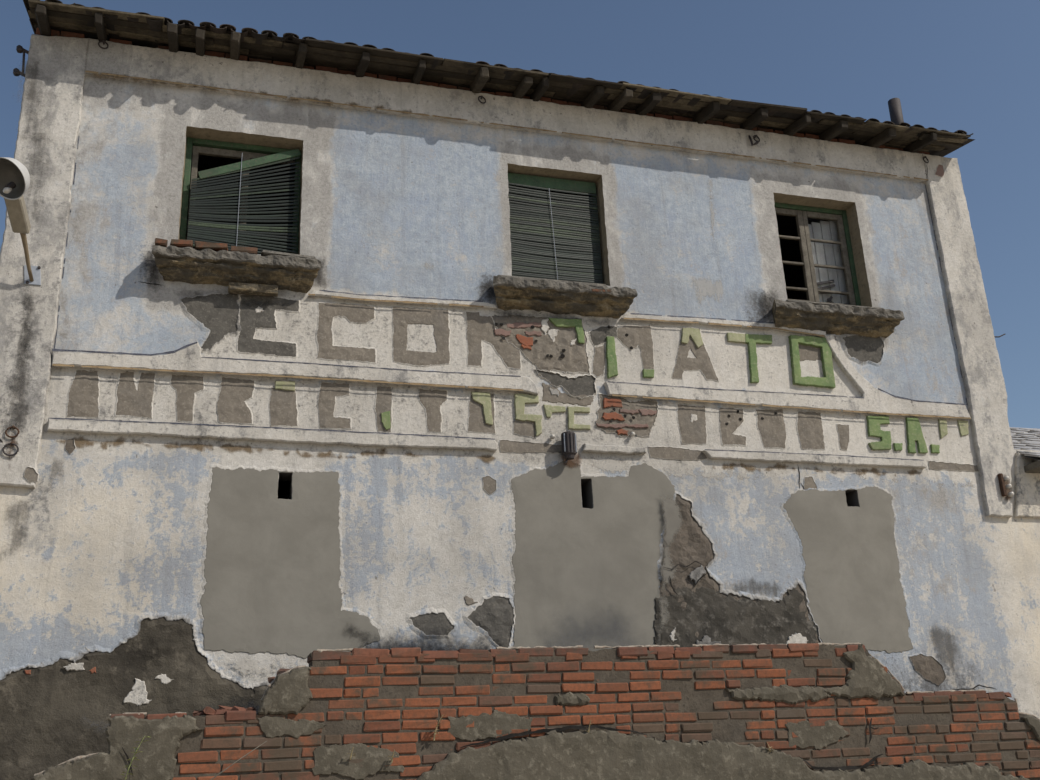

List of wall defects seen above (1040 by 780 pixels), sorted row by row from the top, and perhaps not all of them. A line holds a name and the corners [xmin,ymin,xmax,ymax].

damp [14,300,32,427]
spalling [490,314,708,461]
spalling [839,334,886,367]
spalling [0,611,295,780]
damp [363,631,490,652]
spalling [405,592,516,649]
spalling [653,491,822,648]